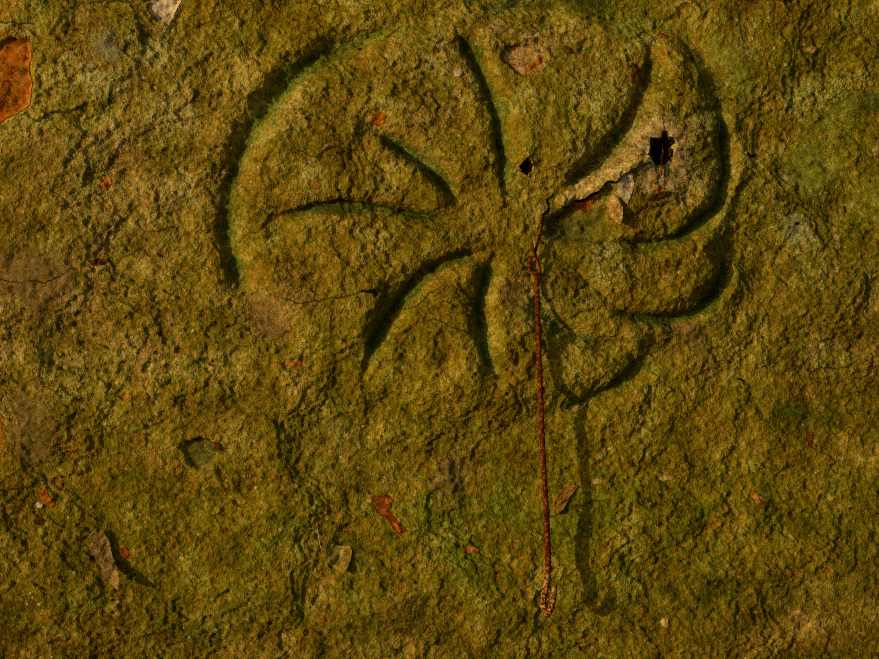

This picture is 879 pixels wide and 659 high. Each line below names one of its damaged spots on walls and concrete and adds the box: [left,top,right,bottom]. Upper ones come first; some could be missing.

flaking render [141,0,181,25]
flaking render [503,30,546,75]
flaking render [0,39,33,122]
crack [26,102,88,137]
flaking render [560,107,694,225]
crack [639,100,757,188]
crack [107,141,187,316]
crack [538,175,623,229]
crack [0,267,76,284]
flaking render [368,491,408,534]